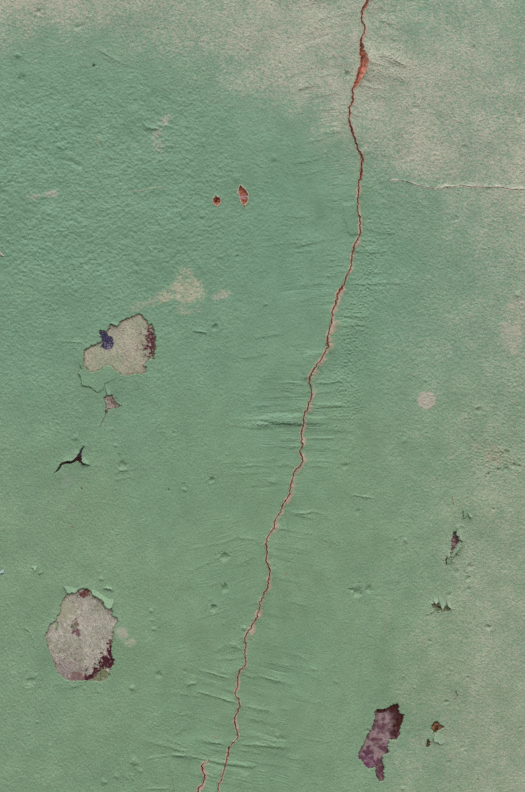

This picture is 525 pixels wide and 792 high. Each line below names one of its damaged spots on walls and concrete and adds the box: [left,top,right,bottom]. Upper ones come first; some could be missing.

hole [237,185,249,211]
crack [389,178,525,193]
peeling [78,314,156,426]
crack [195,0,373,792]
peeling [445,530,464,564]
peeling [45,585,118,682]
peeling [358,703,404,781]
peeling [426,721,446,747]